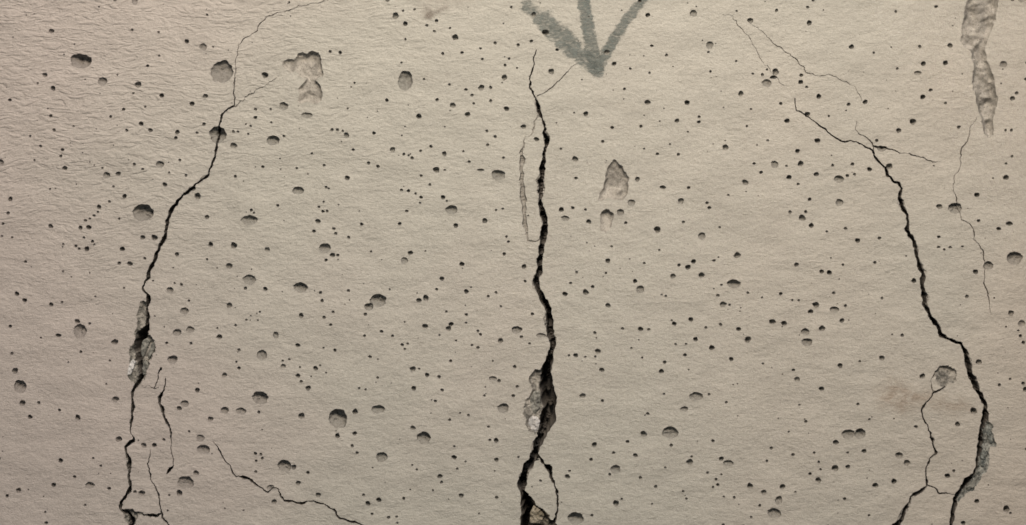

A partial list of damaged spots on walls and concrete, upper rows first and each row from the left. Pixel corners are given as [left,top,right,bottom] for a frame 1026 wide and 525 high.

spalling [111,301,156,383]
crack [119,0,324,525]
crack [215,444,363,525]
spalling [523,369,544,435]
crack [517,49,576,525]
crack [722,14,991,525]